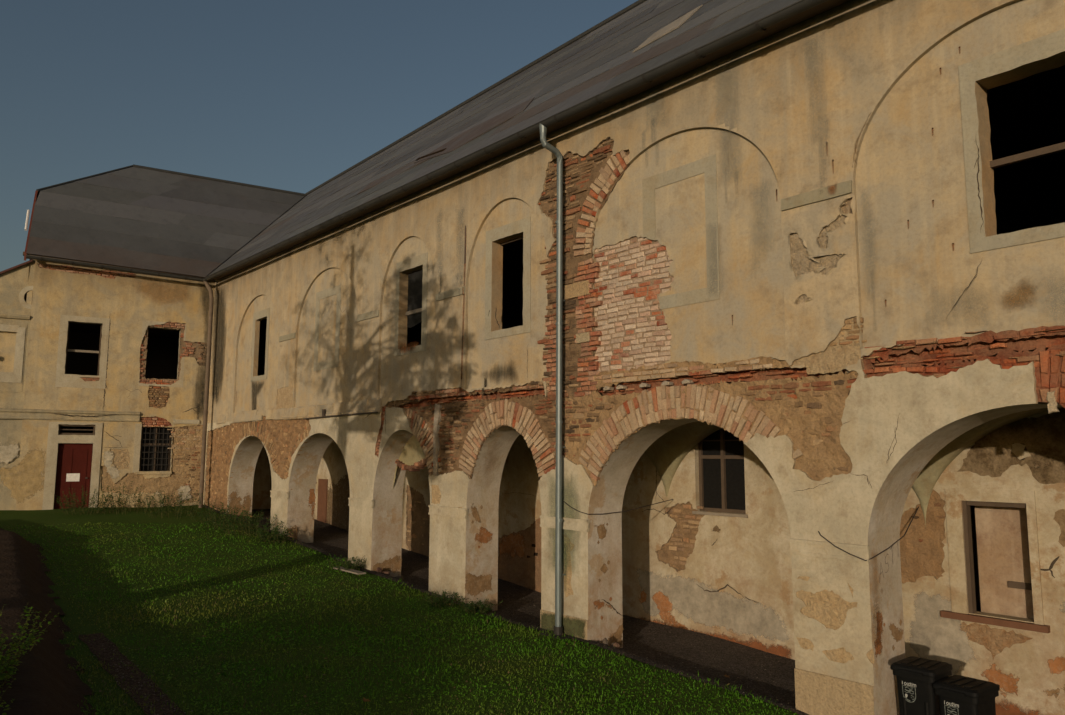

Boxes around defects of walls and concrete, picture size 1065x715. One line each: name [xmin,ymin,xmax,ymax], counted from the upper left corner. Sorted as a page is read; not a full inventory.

crack [974,144,984,231]
spalling [100,322,311,518]
damp [482,366,515,389]
spalling [371,137,1065,573]
crack [697,584,758,603]